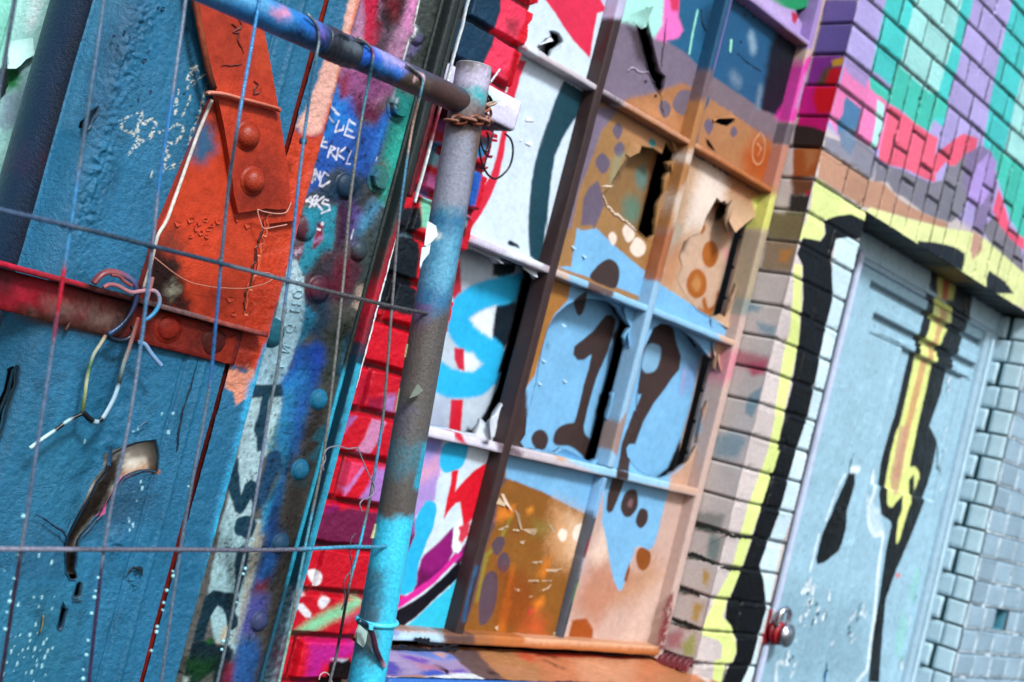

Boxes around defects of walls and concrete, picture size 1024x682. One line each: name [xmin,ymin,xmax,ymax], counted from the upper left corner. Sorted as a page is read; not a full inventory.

crack [627,21,667,73]